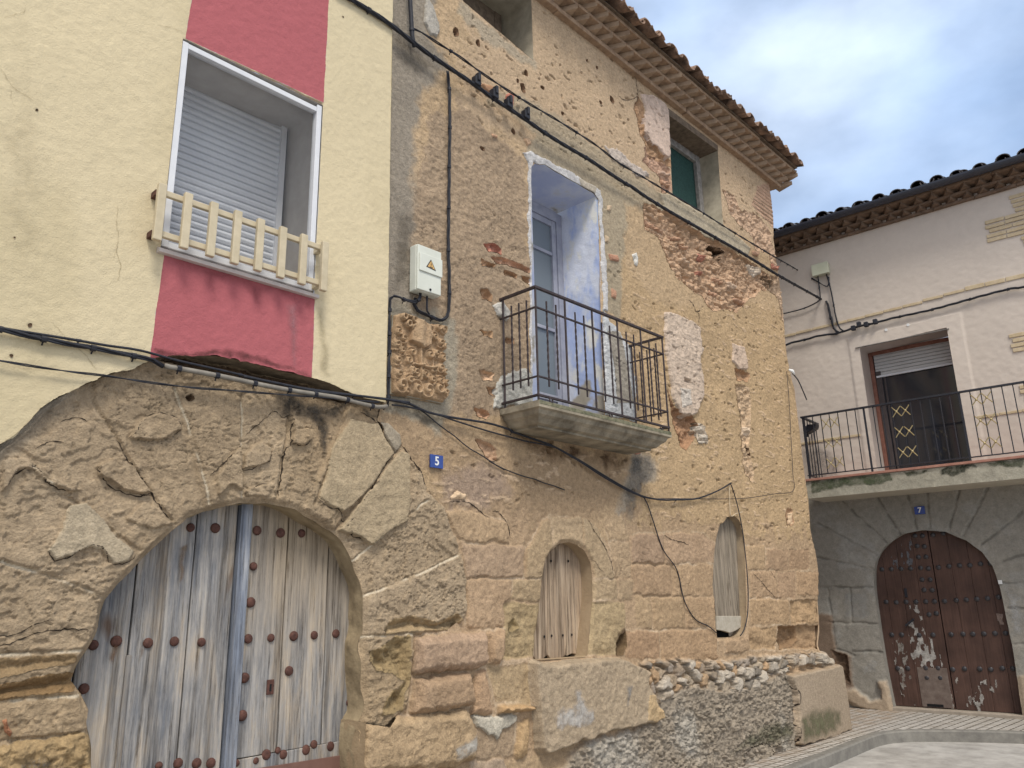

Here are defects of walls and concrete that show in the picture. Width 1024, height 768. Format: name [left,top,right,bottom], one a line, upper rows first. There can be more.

flaking render [604,94,672,194]
flaking render [474,138,637,422]
spalling [642,190,784,323]
crack [210,411,308,495]
flaking render [663,312,709,451]
spalling [732,343,754,483]